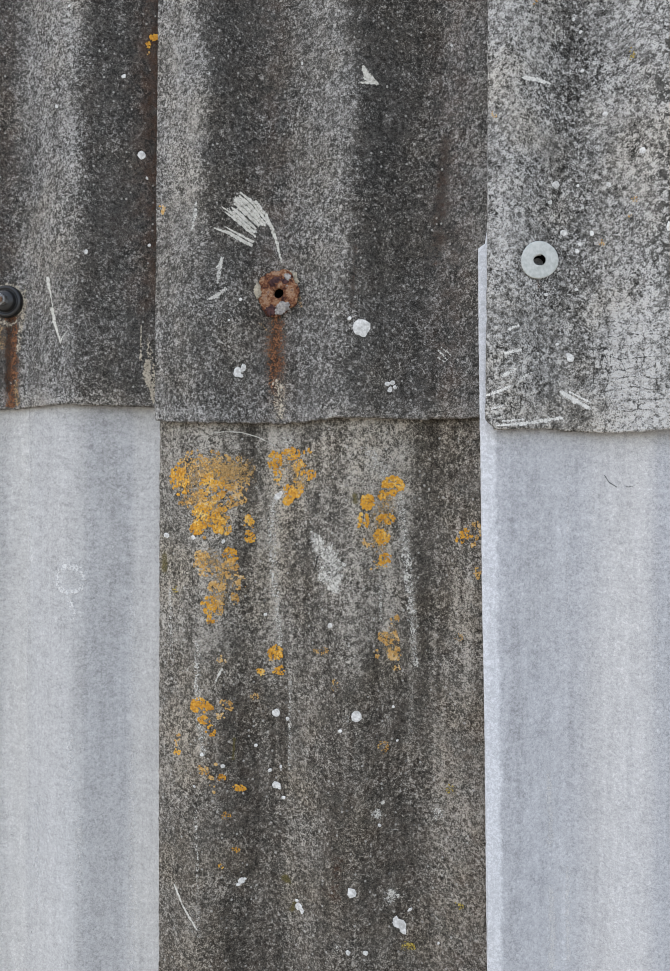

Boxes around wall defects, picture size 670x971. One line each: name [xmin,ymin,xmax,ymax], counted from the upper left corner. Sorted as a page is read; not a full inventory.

corrosion [0,282,28,408]
corrosion [259,316,287,419]